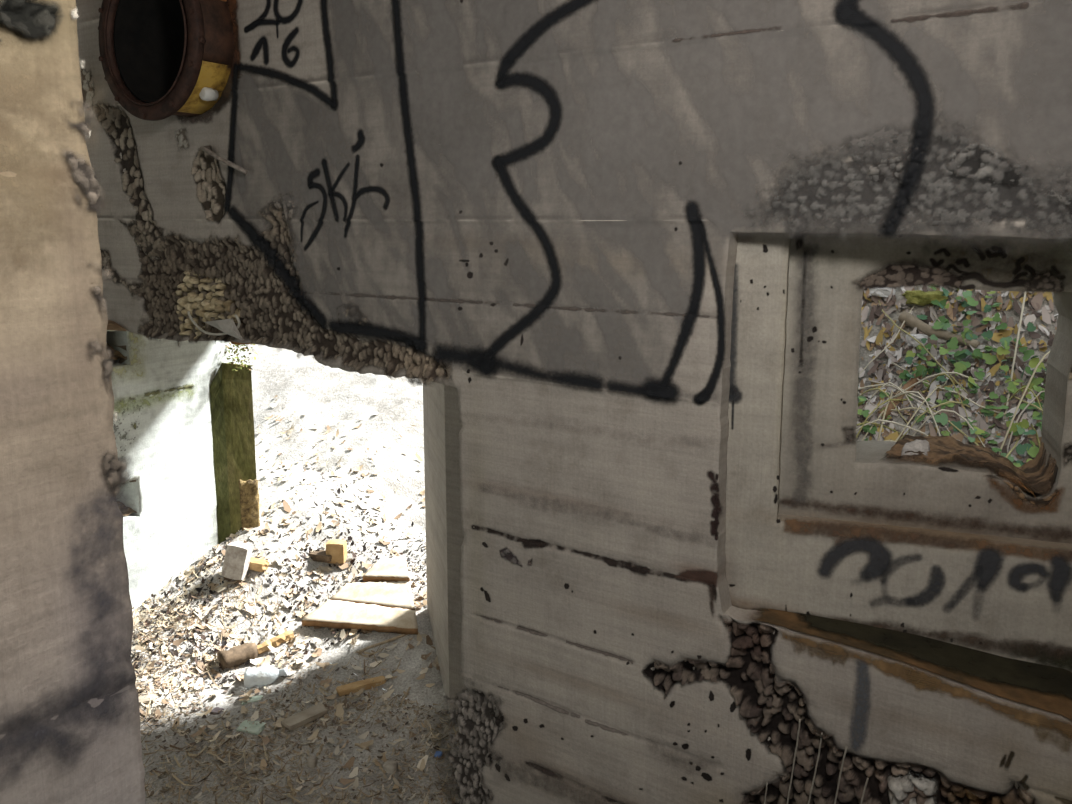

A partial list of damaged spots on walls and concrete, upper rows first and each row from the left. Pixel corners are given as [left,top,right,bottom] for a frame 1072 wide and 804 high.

corrosion [226,0,240,78]
corrosion [177,112,212,123]
spalling [65,61,451,386]
spalling [855,251,962,289]
spalling [758,120,1072,239]
spalling [969,475,1062,512]
water stain [74,496,127,620]
crack [471,525,717,600]
water stain [0,647,127,772]
spalling [444,689,544,804]
spalling [642,616,1036,804]